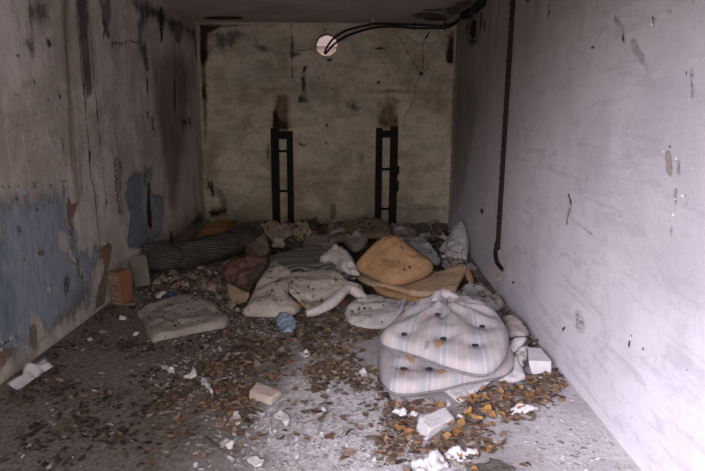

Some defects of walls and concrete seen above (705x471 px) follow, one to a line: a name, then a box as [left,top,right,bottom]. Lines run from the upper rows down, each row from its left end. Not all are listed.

damp [77,0,92,96]
damp [101,0,111,39]
damp [134,0,193,49]
rust [273,95,289,130]
crack [398,31,447,128]
peeling [114,158,165,251]
peeling [0,177,112,372]